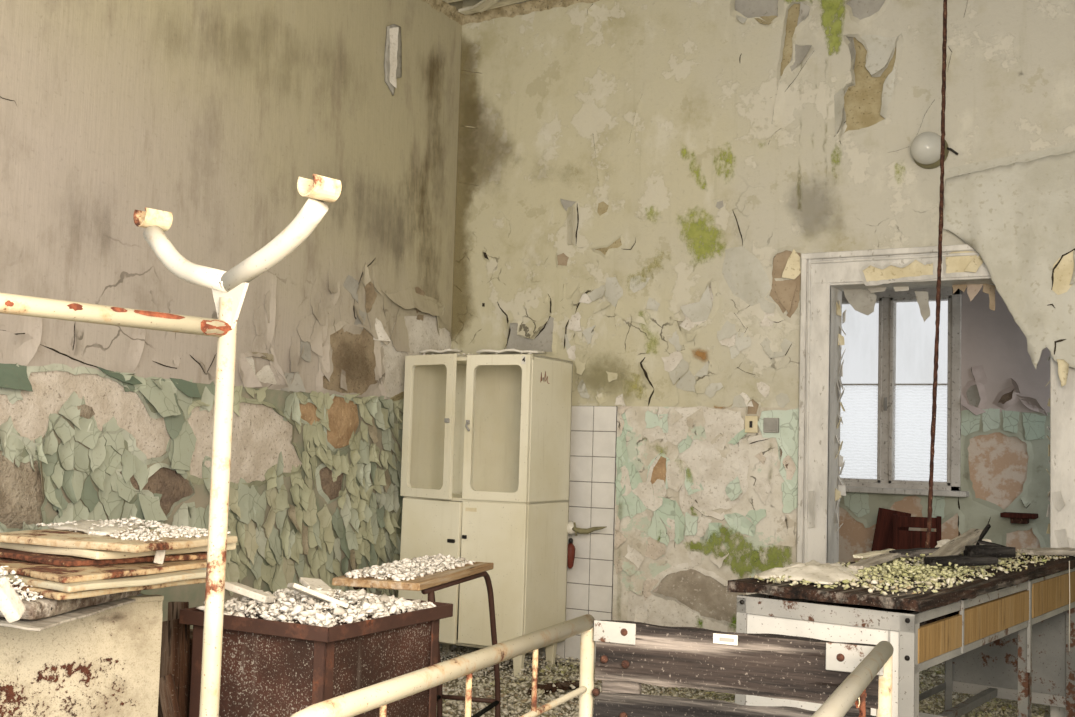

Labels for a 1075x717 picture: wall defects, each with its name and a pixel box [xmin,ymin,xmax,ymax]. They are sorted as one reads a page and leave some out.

peeling [834,0,904,142]
peeling [0,363,215,534]
crack [0,316,217,379]
crack [263,272,304,394]
peeling [225,255,453,597]
water stain [451,44,498,337]
peeling [502,198,815,632]
flaking render [835,301,877,564]
flaking render [886,494,965,540]
peeling [859,151,1075,387]
flaking render [961,378,1050,512]
rust [0,657,136,717]